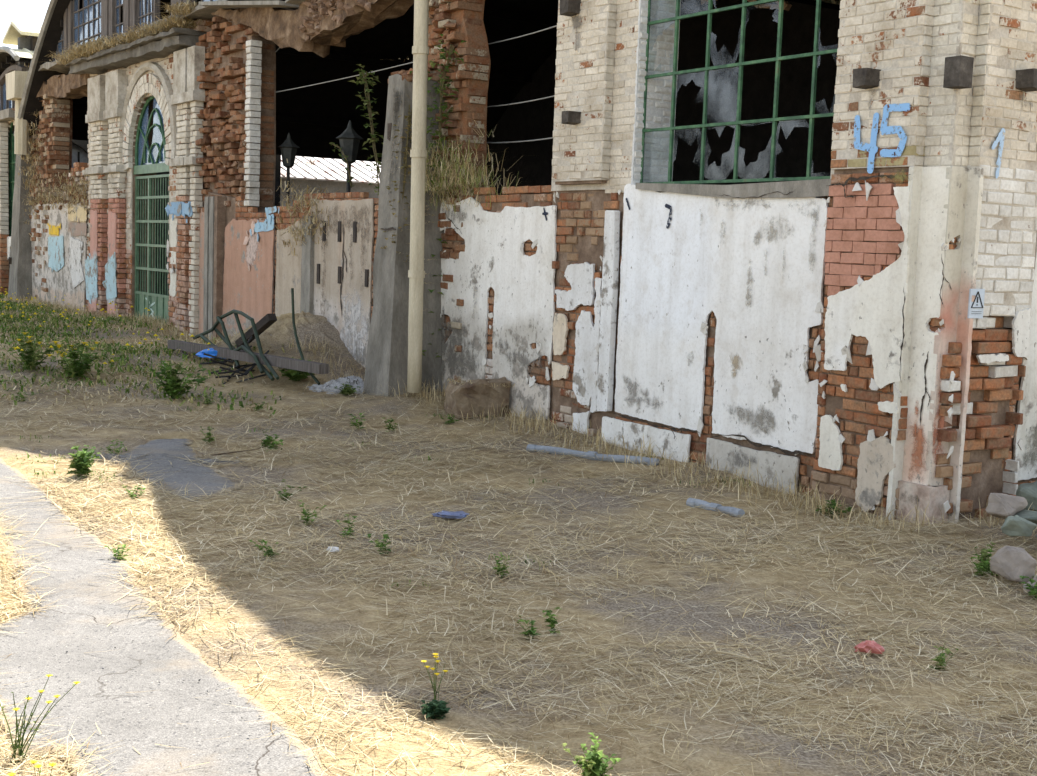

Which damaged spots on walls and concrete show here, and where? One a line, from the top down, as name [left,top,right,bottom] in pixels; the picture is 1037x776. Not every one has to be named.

peeling [47,201,117,304]
flaking render [526,190,622,436]
water stain [624,378,659,406]
water stain [730,406,775,433]
flaking render [795,180,908,520]
flaking render [935,317,1026,518]
water stain [1023,427,1037,464]